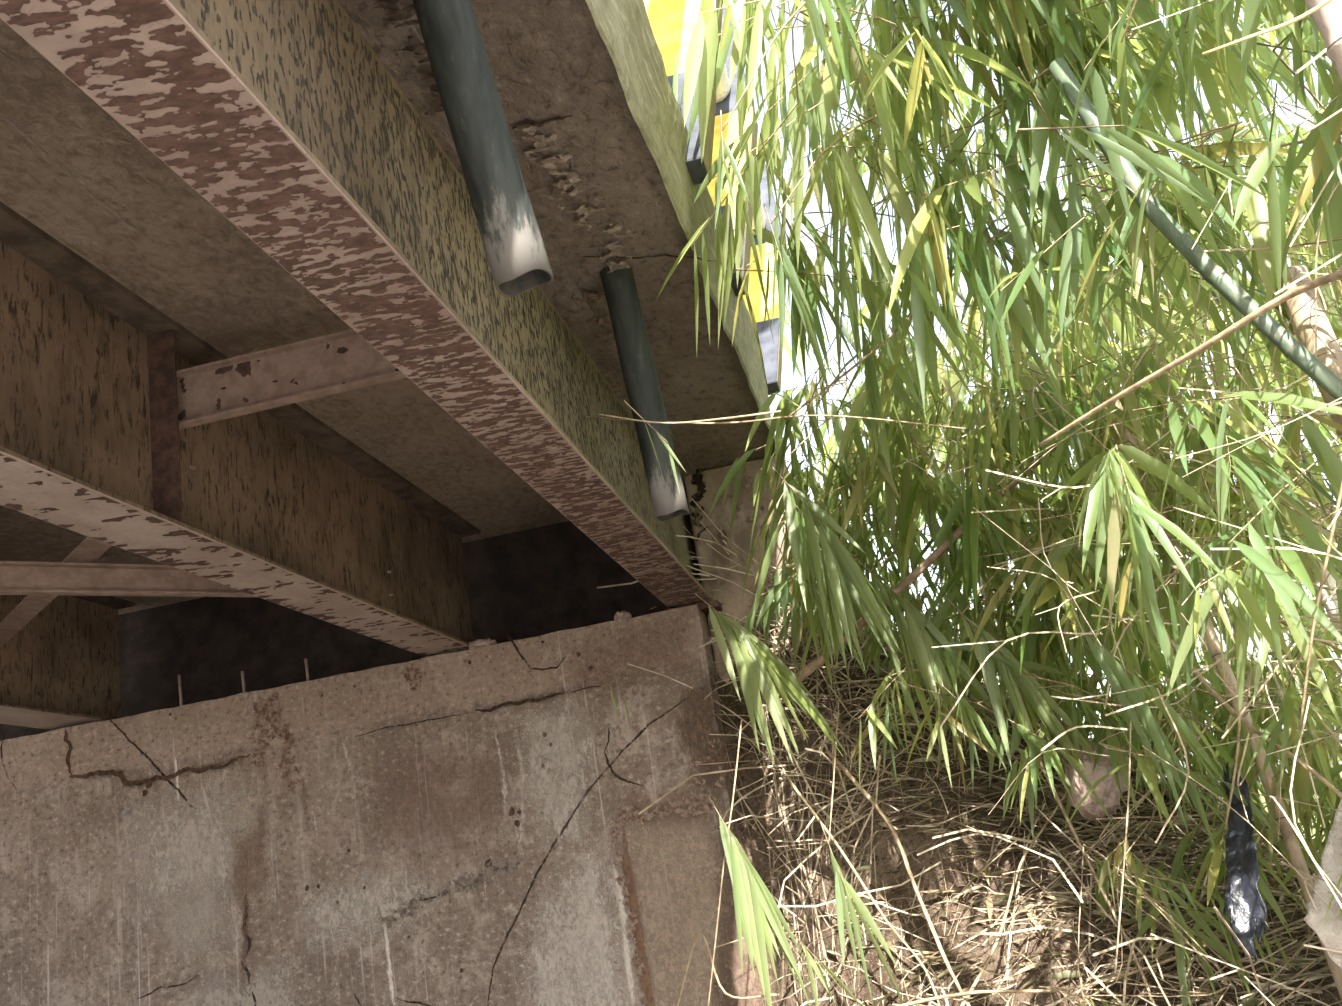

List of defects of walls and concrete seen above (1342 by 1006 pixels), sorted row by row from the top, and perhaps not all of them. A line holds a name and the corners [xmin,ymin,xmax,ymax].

rust [215,360,260,410]
peeling [0,0,711,608]
peeling [28,471,471,692]
crack [355,633,600,737]
crack [63,719,256,1006]
crack [487,697,690,1006]